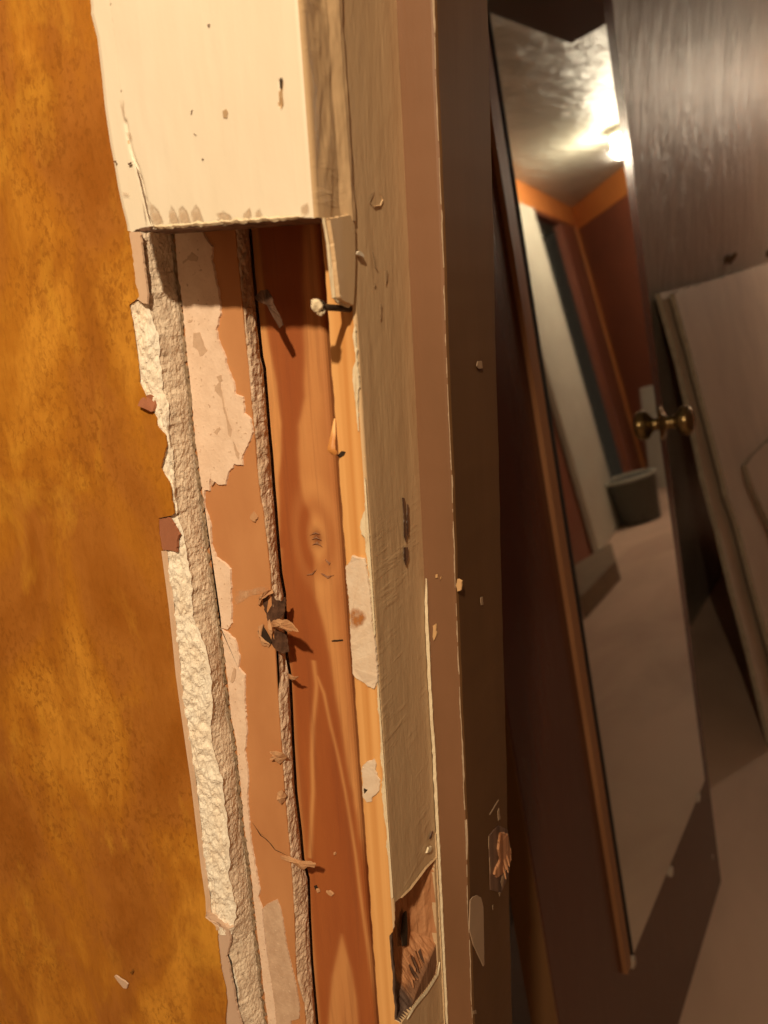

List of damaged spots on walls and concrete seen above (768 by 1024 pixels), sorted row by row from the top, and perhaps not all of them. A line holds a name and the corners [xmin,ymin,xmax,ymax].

spalling [129,220,319,1024]
peeling [360,478,376,635]
peeling [459,687,506,1024]